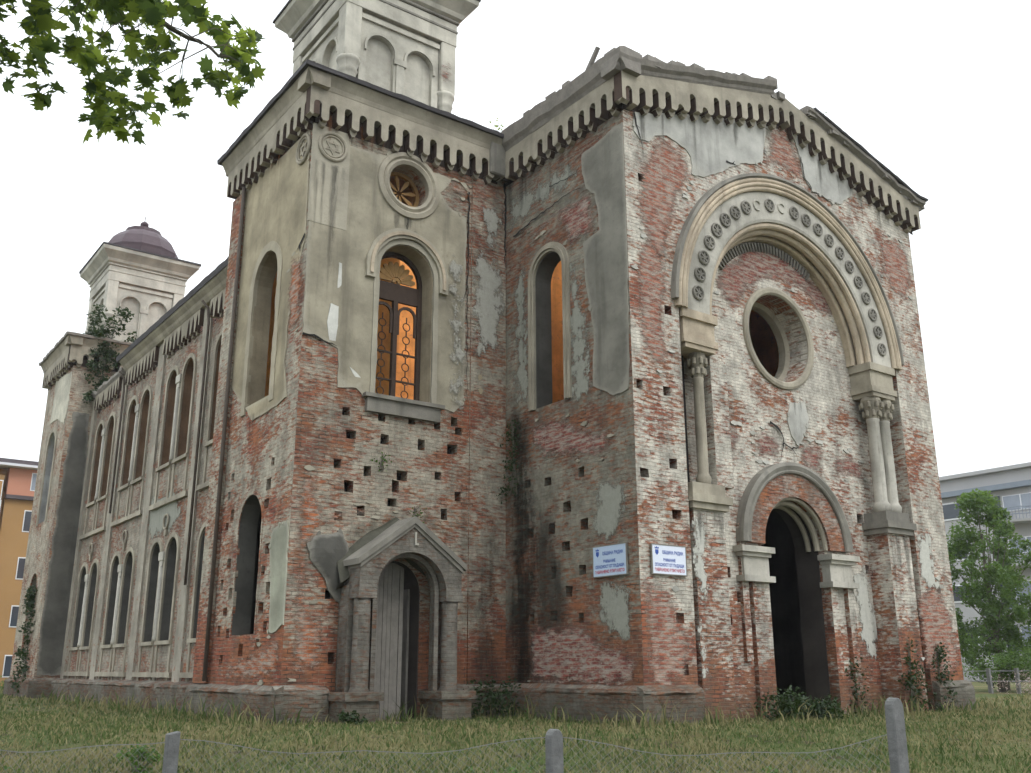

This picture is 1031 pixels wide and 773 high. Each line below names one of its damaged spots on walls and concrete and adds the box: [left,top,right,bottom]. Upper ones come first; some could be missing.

flaking render [437,176,528,406]
flaking render [569,263,592,401]
flaking render [631,141,697,373]
flaking render [713,251,834,322]
flaking render [880,234,913,300]
flaking render [287,465,404,682]
water stain [513,418,530,682]
flaking render [593,482,628,540]
flaking render [527,581,708,686]
flaking render [692,517,708,599]
flaking render [854,565,878,659]
flaking render [916,534,958,674]